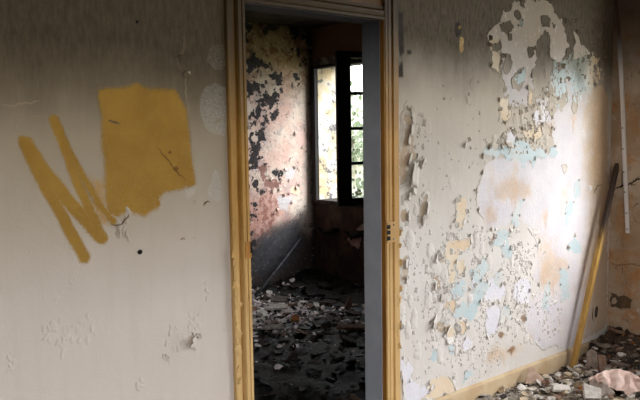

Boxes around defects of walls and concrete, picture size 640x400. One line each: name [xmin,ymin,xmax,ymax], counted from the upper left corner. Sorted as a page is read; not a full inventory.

peeling [295,128,308,149]
peeling [253,163,301,237]
peeling [396,0,634,400]
spalling [601,388,640,400]